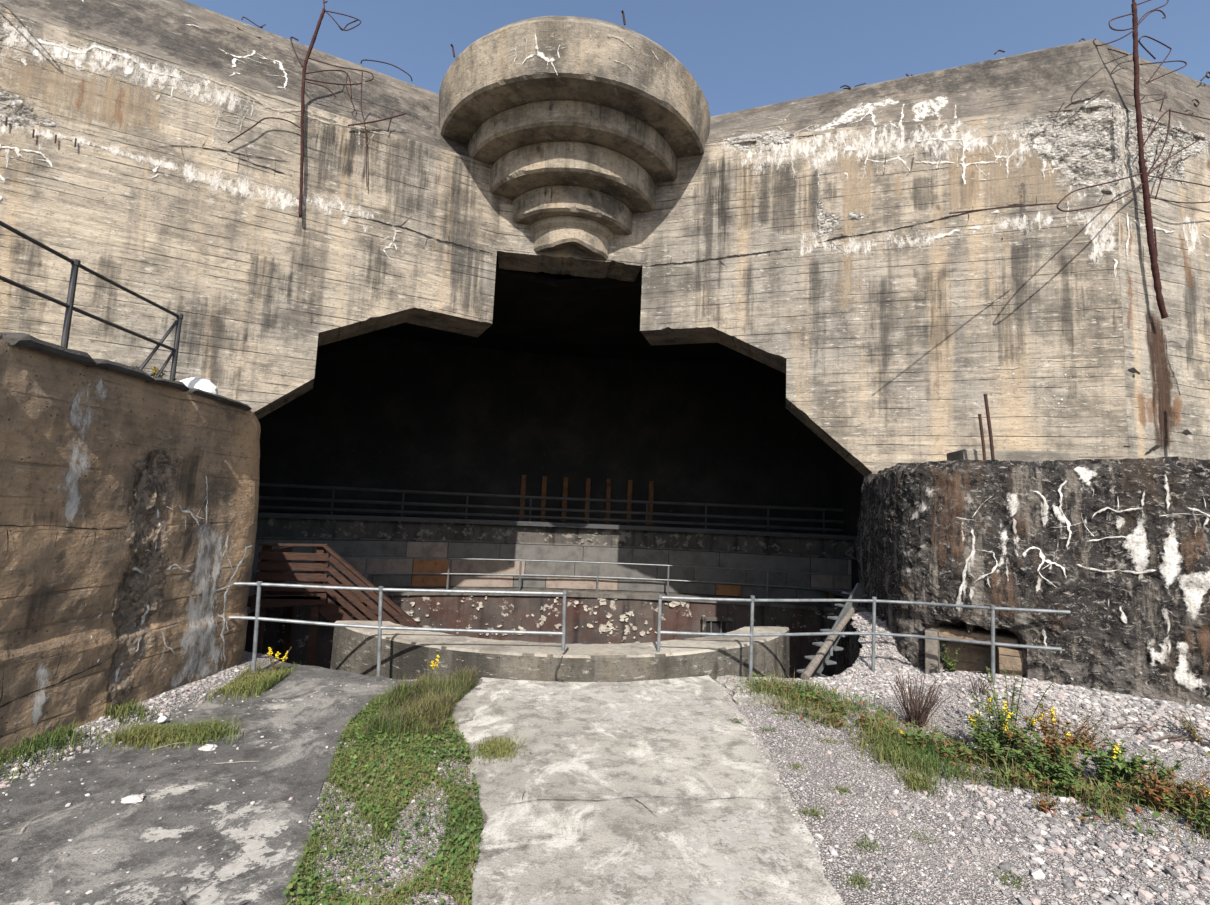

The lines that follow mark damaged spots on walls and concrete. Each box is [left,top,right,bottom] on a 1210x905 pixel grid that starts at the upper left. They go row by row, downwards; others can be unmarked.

leakage [0,21,250,127]
spalling [0,19,374,232]
crack [646,136,1043,267]
leakage [740,96,1210,293]
corrosion [949,0,1210,453]
spalling [1016,97,1210,202]
spalling [97,446,180,709]
peeling [466,597,657,643]
leakage [997,493,1020,576]
leakage [1033,466,1097,549]
leakage [1116,476,1210,619]
leakage [1147,610,1207,705]